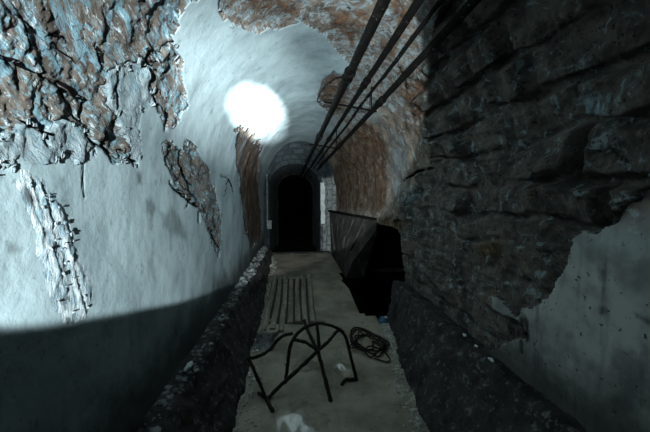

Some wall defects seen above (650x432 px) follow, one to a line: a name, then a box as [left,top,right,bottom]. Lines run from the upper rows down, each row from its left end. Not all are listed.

flaking render [218,0,377,63]
flaking render [0,0,198,326]
flaking render [162,140,222,253]
flaking render [234,125,264,249]
flaking render [318,0,650,352]